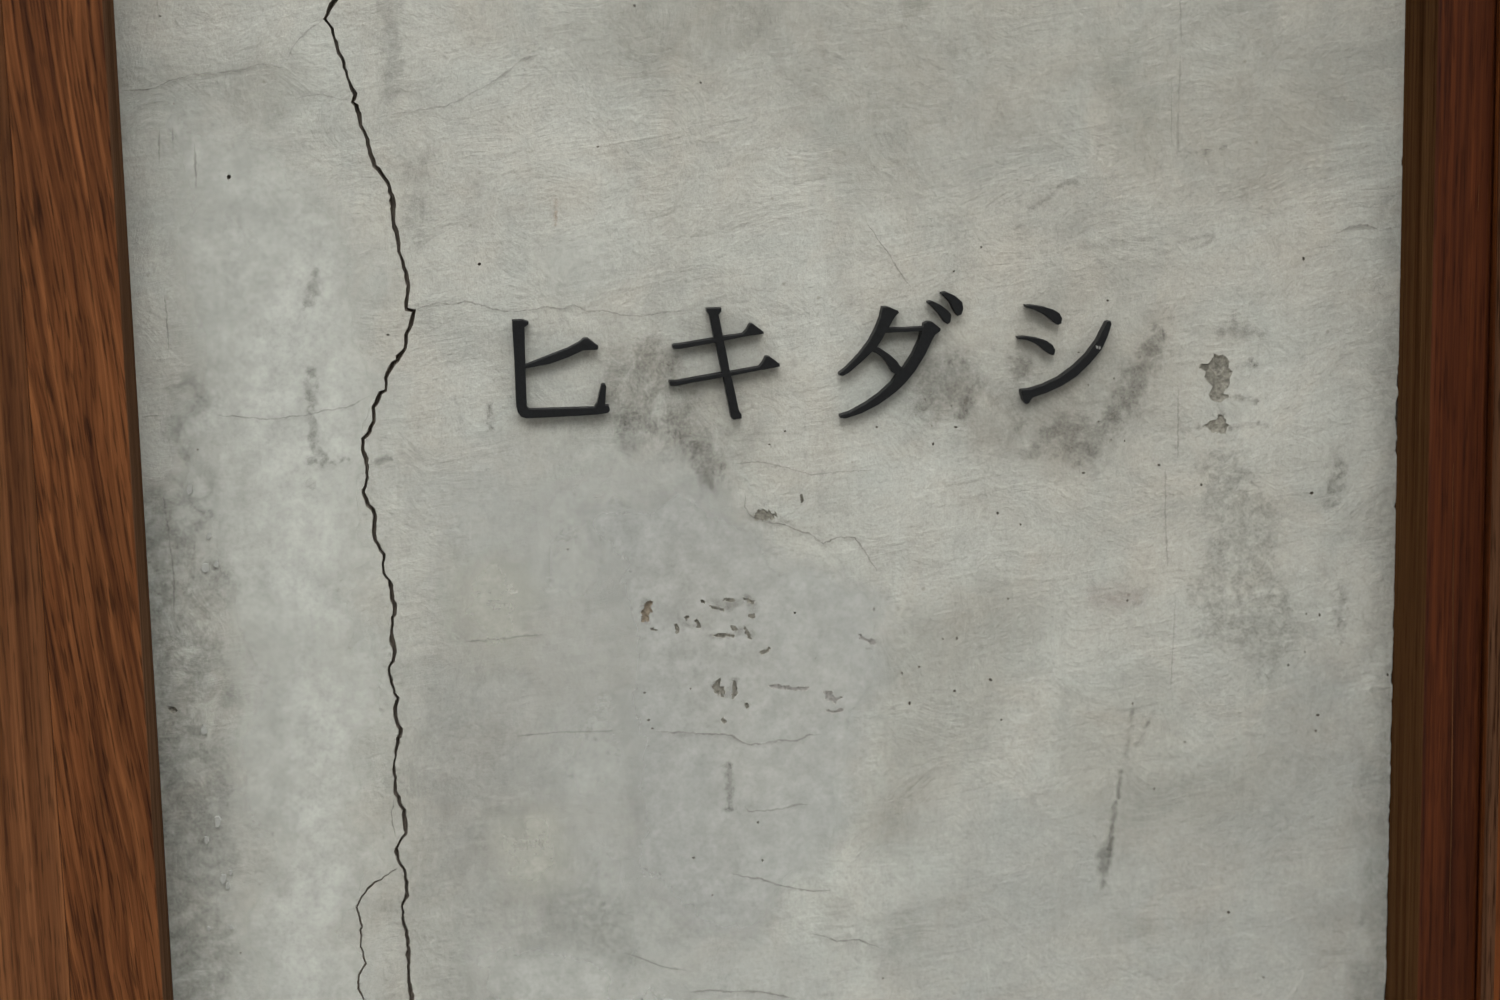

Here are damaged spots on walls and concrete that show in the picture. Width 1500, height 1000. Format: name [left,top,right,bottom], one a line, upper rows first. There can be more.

spalling [1199,354,1232,434]
crack [323,0,567,1000]
spalling [641,600,657,631]
spalling [675,597,771,655]
spalling [712,678,749,708]
spalling [769,683,844,713]